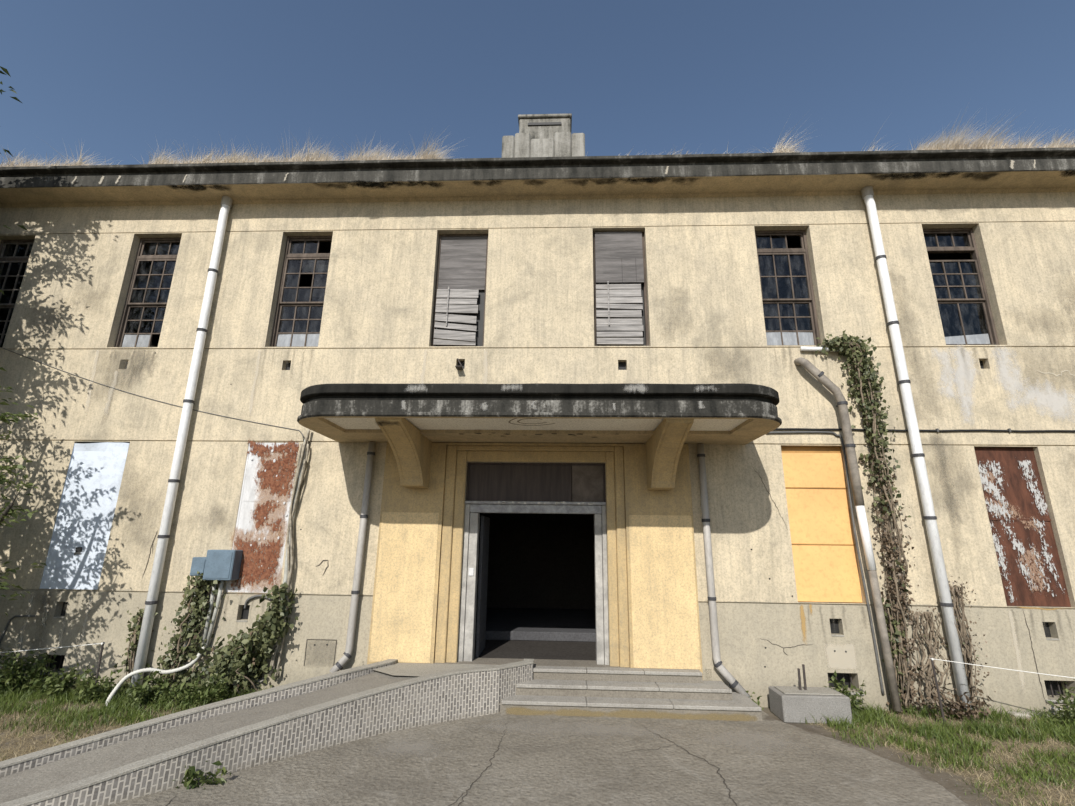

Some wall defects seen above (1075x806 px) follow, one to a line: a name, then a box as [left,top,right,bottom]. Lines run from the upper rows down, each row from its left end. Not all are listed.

rust [231,440,299,590]
rust [981,471,1041,531]
rust [1019,546,1051,591]
crack [449,724,507,806]
crack [633,720,737,806]